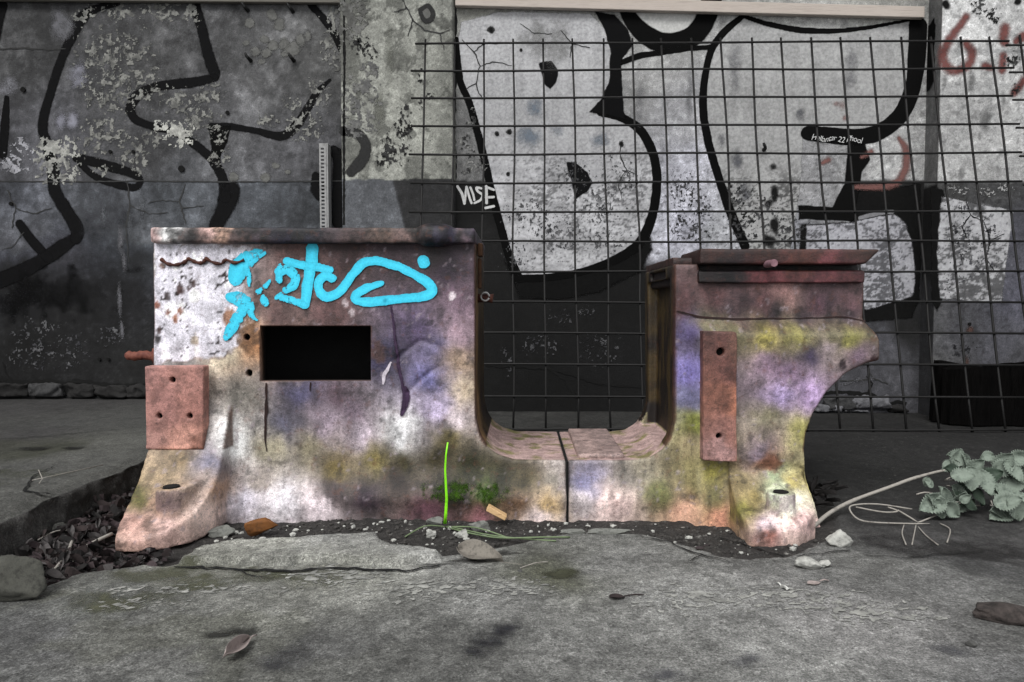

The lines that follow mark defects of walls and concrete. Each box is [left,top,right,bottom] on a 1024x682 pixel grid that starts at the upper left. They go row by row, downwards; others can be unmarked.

peeling [1,3,239,185]